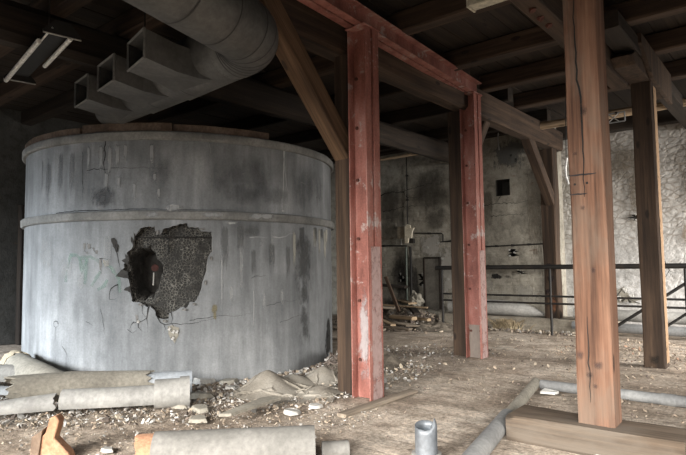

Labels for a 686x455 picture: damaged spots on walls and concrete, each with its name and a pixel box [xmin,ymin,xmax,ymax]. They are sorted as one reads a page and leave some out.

crack [48,141,146,214]
water stain [93,145,127,205]
spalling [111,223,213,343]
crack [127,306,248,333]
water stain [221,222,327,276]
crack [585,321,593,402]